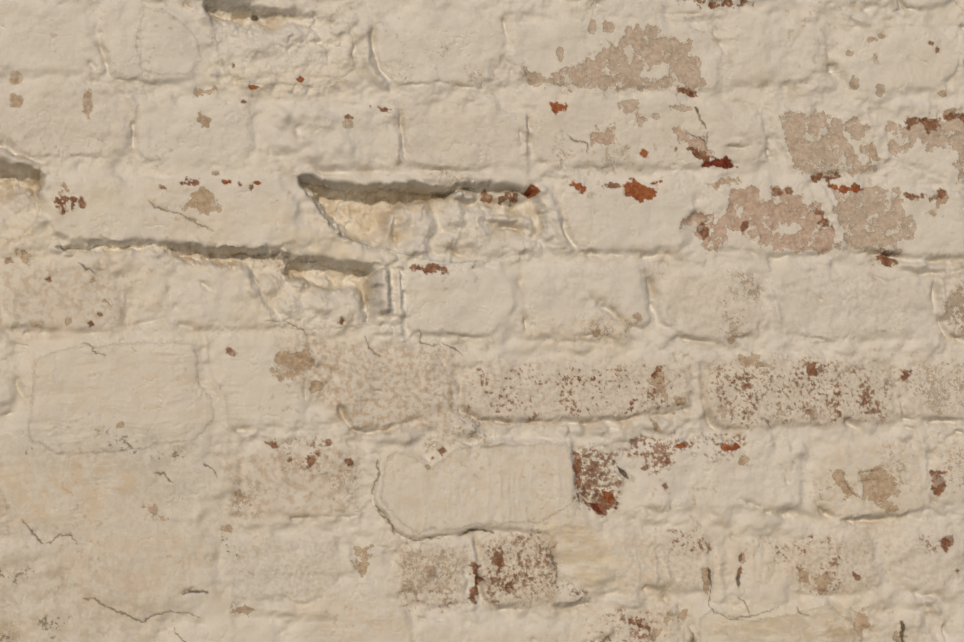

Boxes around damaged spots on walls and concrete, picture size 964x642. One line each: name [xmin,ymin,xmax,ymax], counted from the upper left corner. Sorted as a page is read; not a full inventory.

peeling [524,20,706,127]
spalling [602,178,662,203]
peeling [673,108,964,267]
peeling [900,364,963,410]
spalling [572,448,628,515]